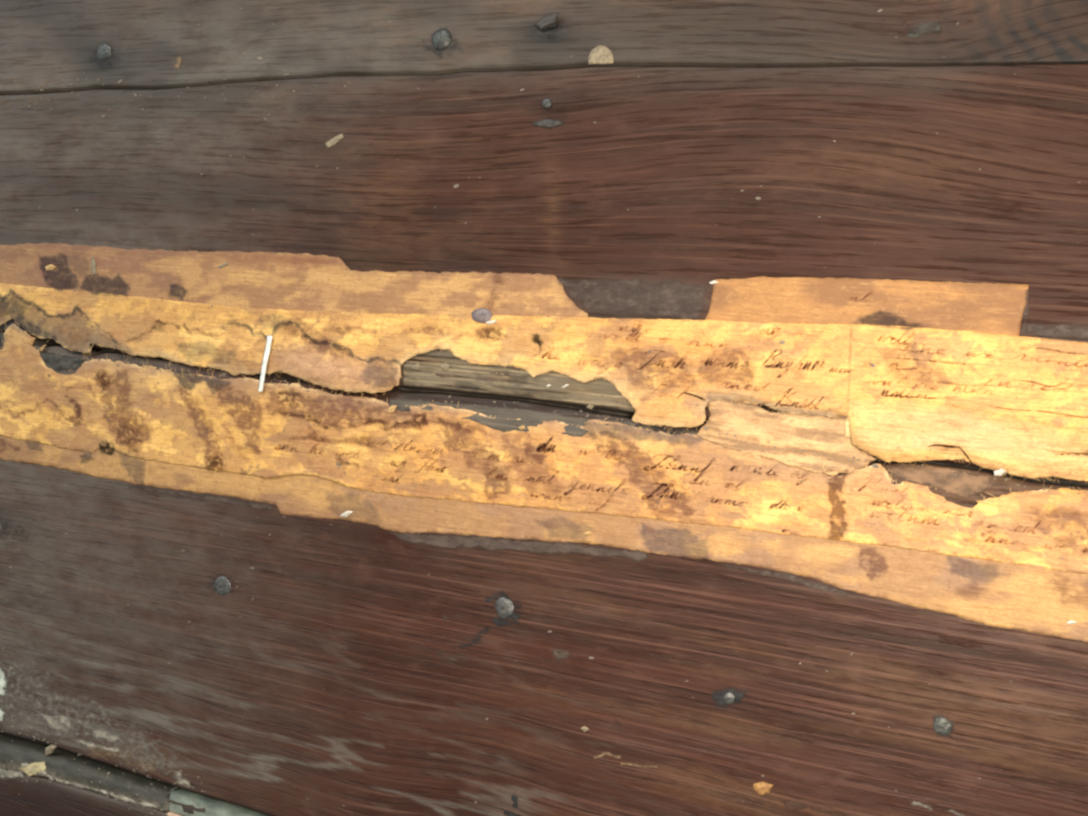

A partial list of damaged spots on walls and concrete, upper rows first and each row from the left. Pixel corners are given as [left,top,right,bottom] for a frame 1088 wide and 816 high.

crack [0,332,62,347]
crack [90,343,171,361]
crack [205,367,312,384]
crack [344,385,634,420]
crack [684,392,707,427]
crack [757,404,790,413]
crack [867,453,1088,488]